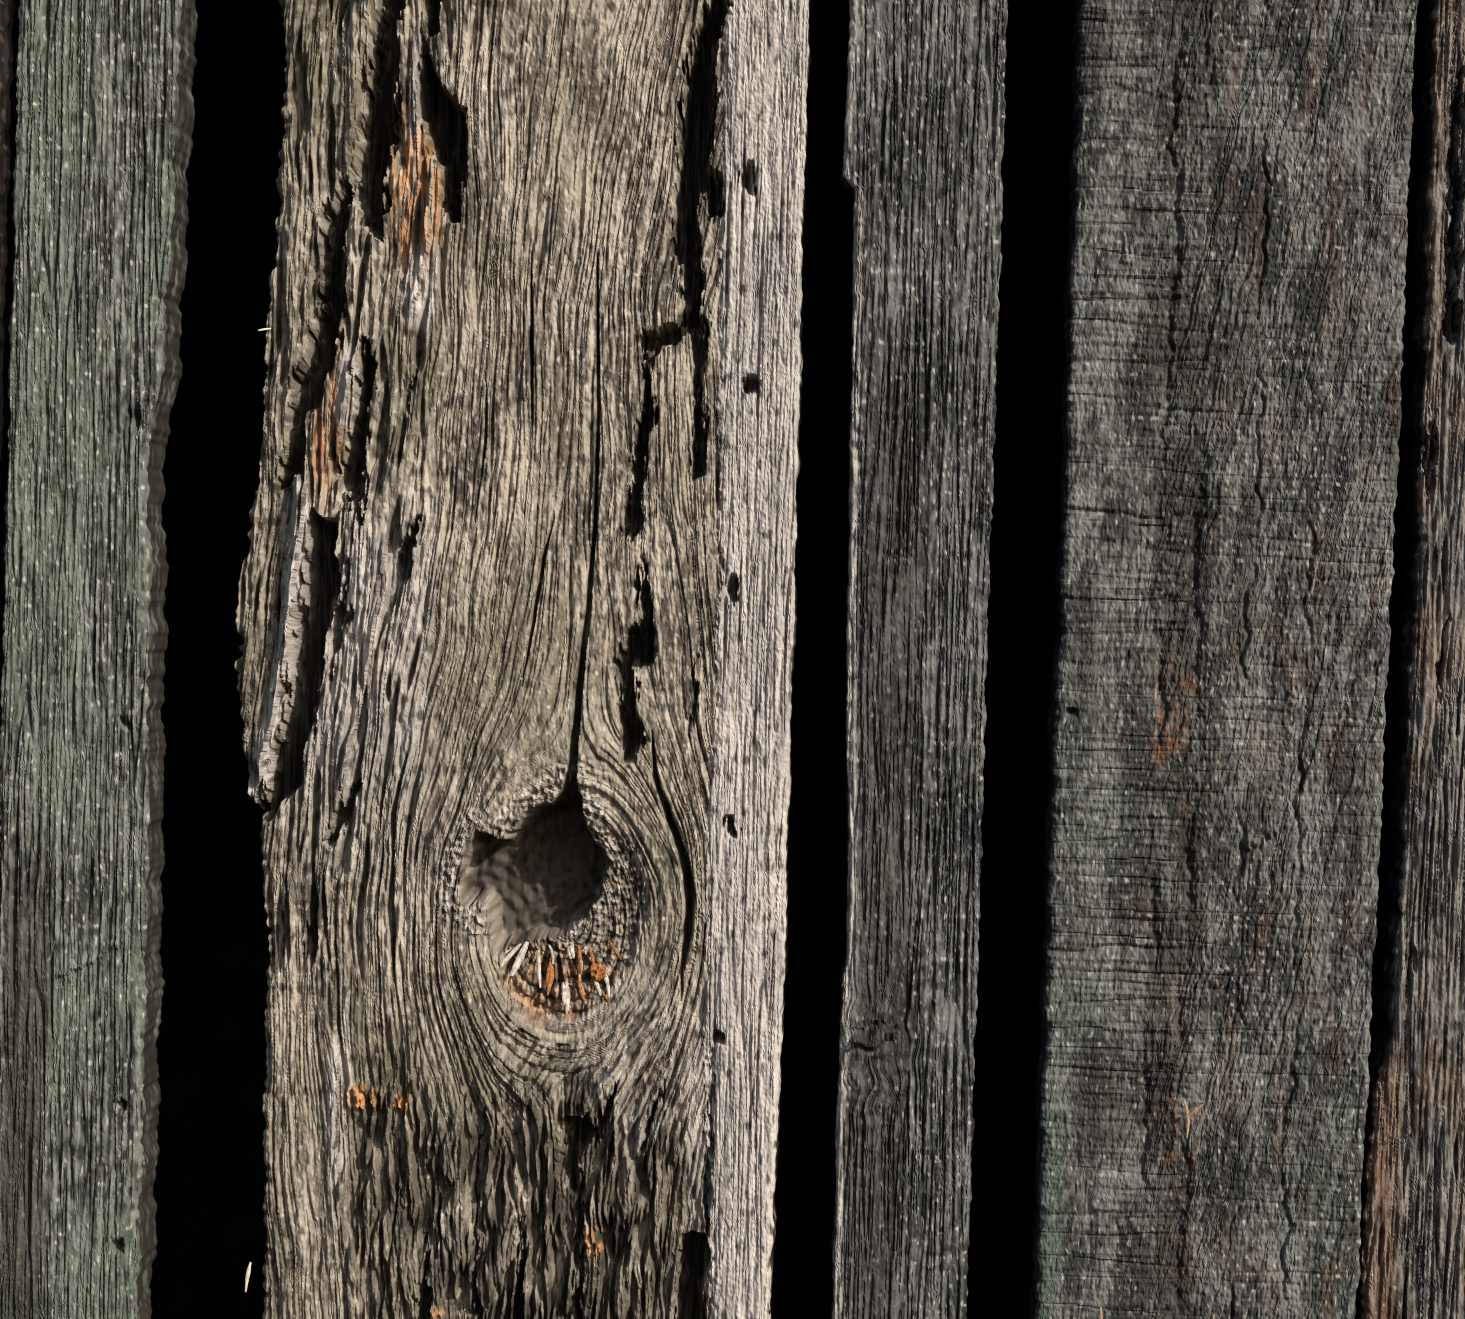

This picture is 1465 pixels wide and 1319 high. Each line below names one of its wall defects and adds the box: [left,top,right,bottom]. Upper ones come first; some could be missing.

crack [262,0,470,825]
crack [474,348,490,525]
crack [527,251,536,429]
crack [521,513,556,689]
crack [561,0,734,1003]
crack [322,766,367,851]
crack [301,893,323,984]
crack [391,1101,532,1319]
crack [556,1079,671,1319]
crack [673,1030,718,1319]